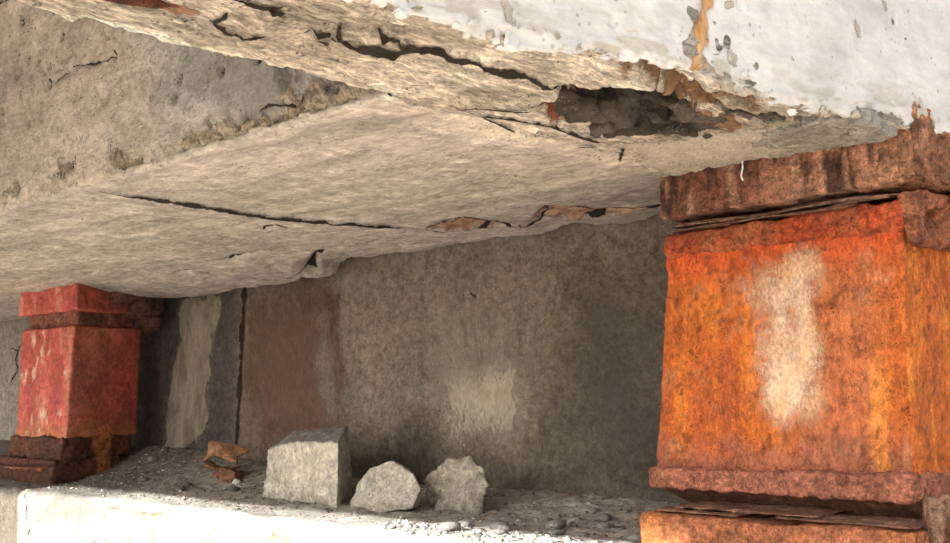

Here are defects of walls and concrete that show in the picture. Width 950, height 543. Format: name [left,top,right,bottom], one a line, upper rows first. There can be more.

spalling [103,0,200,16]
crack [210,0,558,91]
peeling [451,0,520,53]
rust [691,0,713,72]
water stain [251,66,298,117]
water stain [304,78,340,104]
crack [449,105,625,162]
spalling [553,54,897,178]
crack [97,191,401,259]
crack [425,205,608,233]
rust [670,189,950,252]
rust [655,501,923,529]